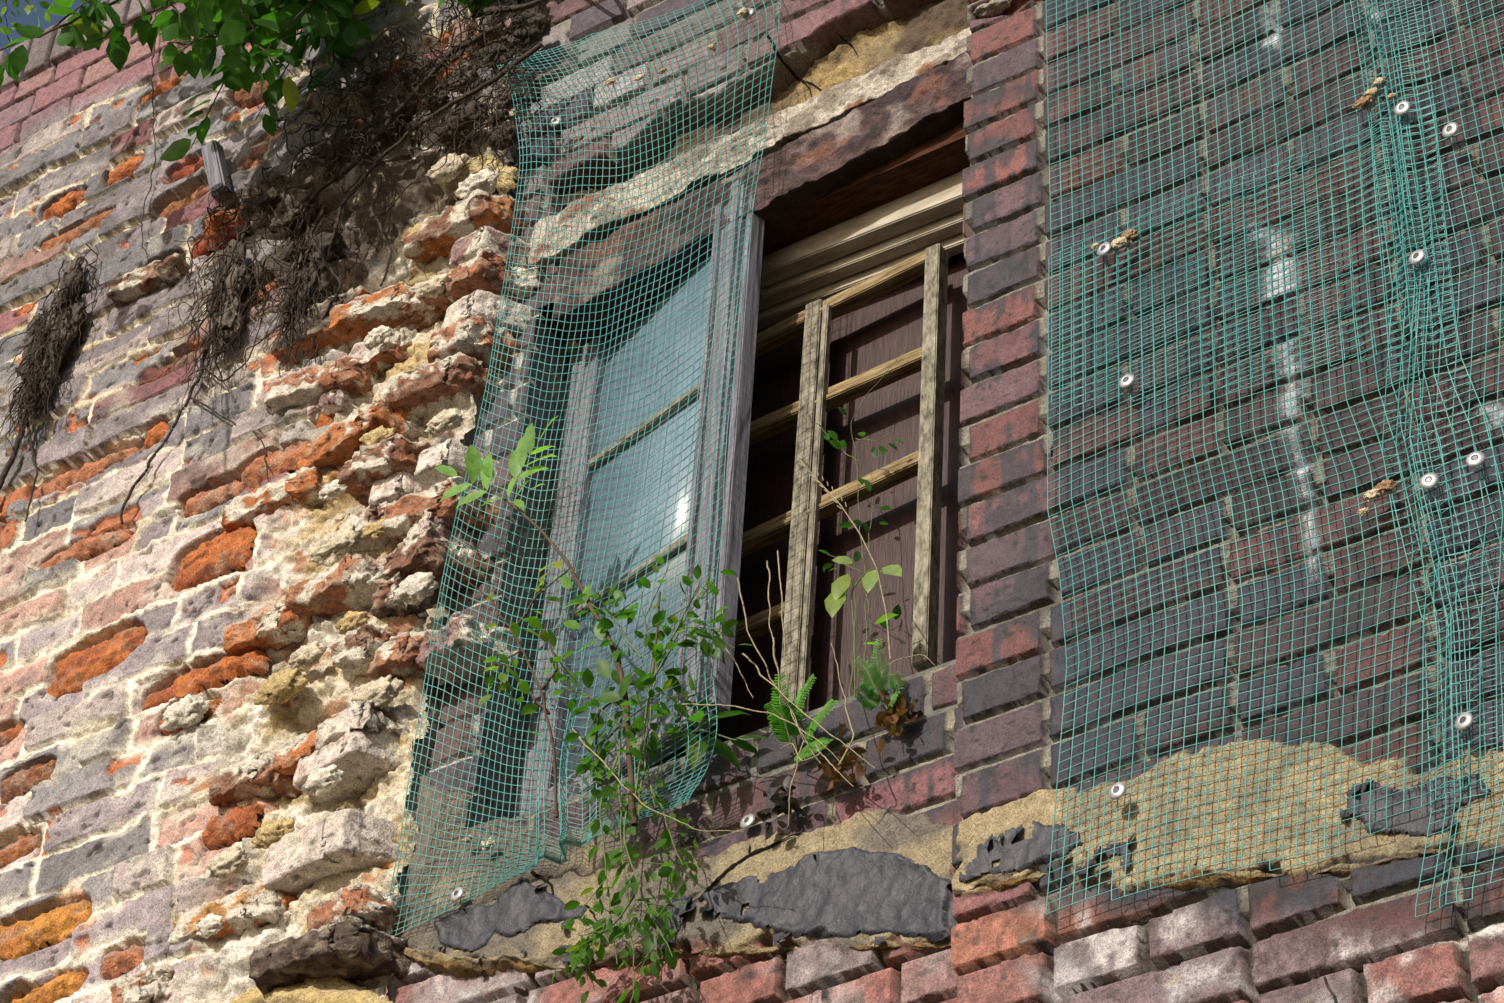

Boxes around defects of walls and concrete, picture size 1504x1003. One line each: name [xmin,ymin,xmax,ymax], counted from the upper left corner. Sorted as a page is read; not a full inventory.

crack [767,33,822,96]
spalling [624,0,970,182]
spalling [41,190,115,251]
spalling [106,206,252,308]
spalling [138,189,543,736]
spalling [40,529,135,569]
spalling [47,626,148,699]
spalling [168,699,441,994]
crack [679,832,802,923]
peeling [639,821,1134,950]
peeling [1338,773,1489,837]
spalling [10,944,175,1003]